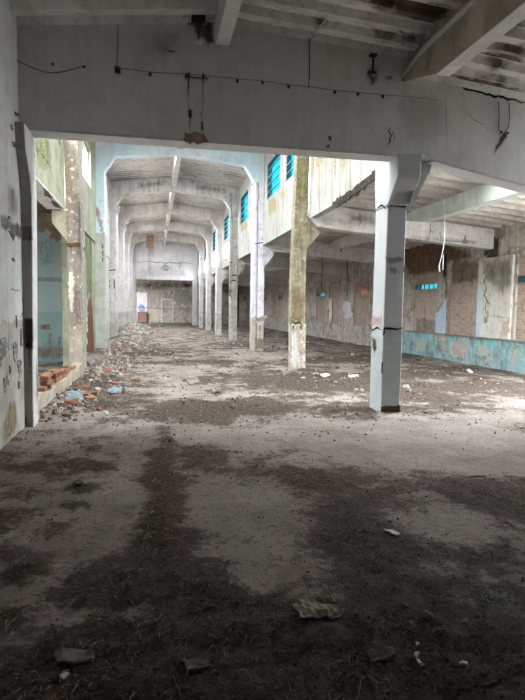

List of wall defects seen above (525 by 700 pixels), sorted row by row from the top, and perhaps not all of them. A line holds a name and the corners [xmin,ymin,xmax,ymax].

leakage [371,0,450,24]
crack [462,87,525,103]
spalling [184,132,208,145]
spalling [332,170,375,208]
crack [371,326,403,334]
peeling [439,333,489,360]
peeling [0,335,23,393]